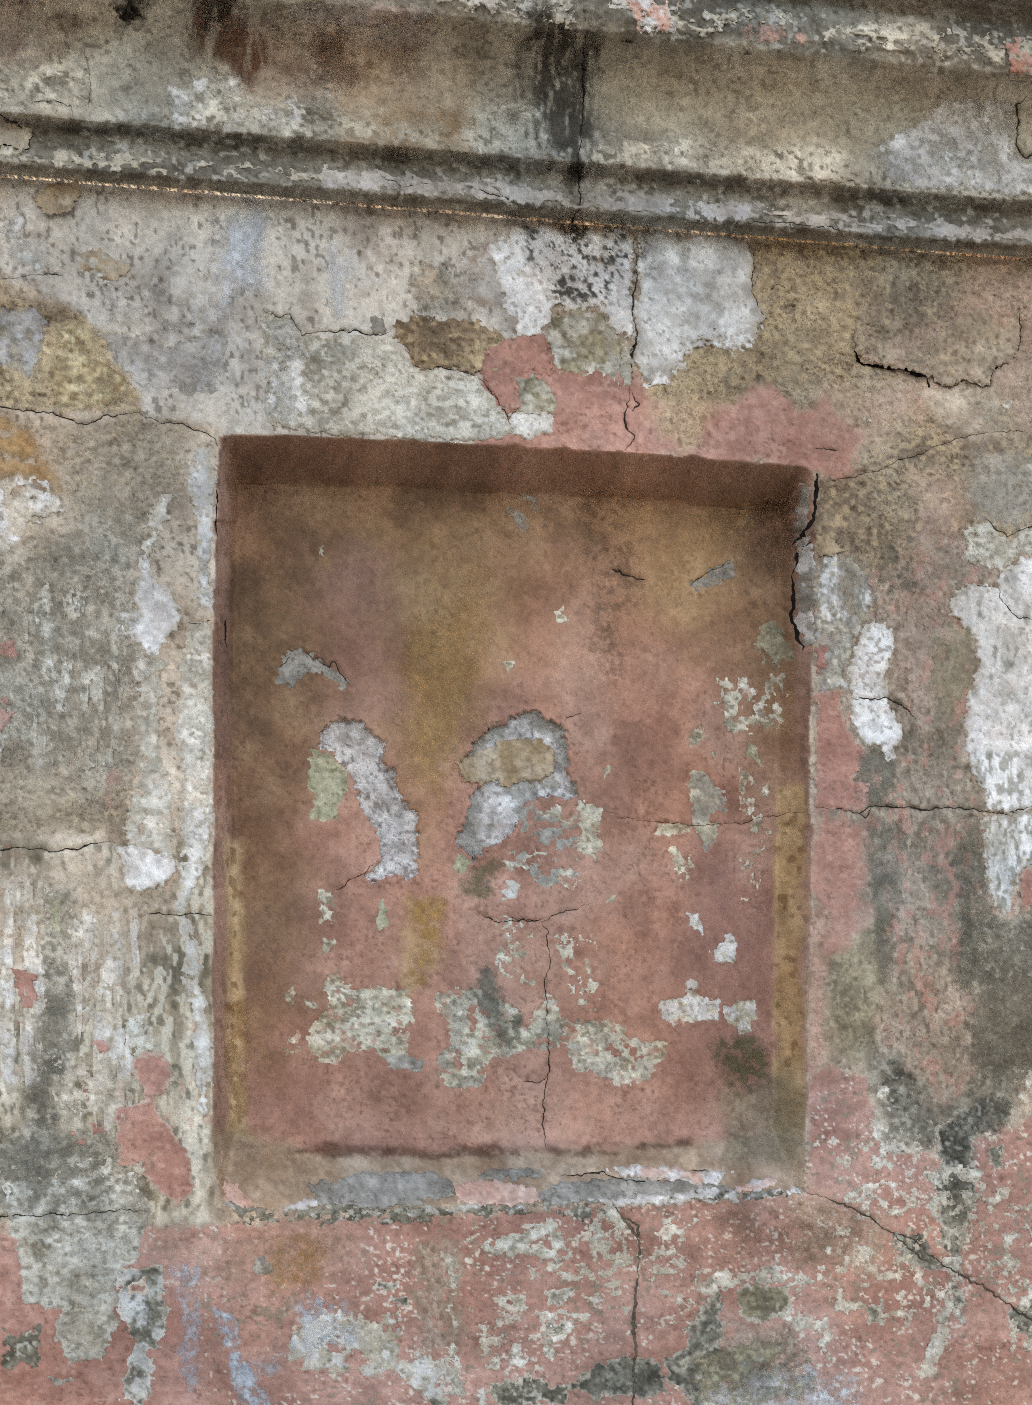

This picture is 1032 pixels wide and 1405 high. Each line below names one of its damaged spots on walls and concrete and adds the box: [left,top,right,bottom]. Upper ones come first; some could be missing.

water stain [194,0,266,82]
water stain [529,4,599,185]
peeling [0,49,1032,443]
crack [854,309,1022,387]
peeling [948,521,1032,916]
peeling [0,446,216,1405]
flaking render [283,710,757,1091]
water stain [870,823,902,975]
crack [482,907,717,1405]
water stain [882,1059,919,1110]
water stain [940,1092,1011,1158]
crack [807,1192,1032,1321]